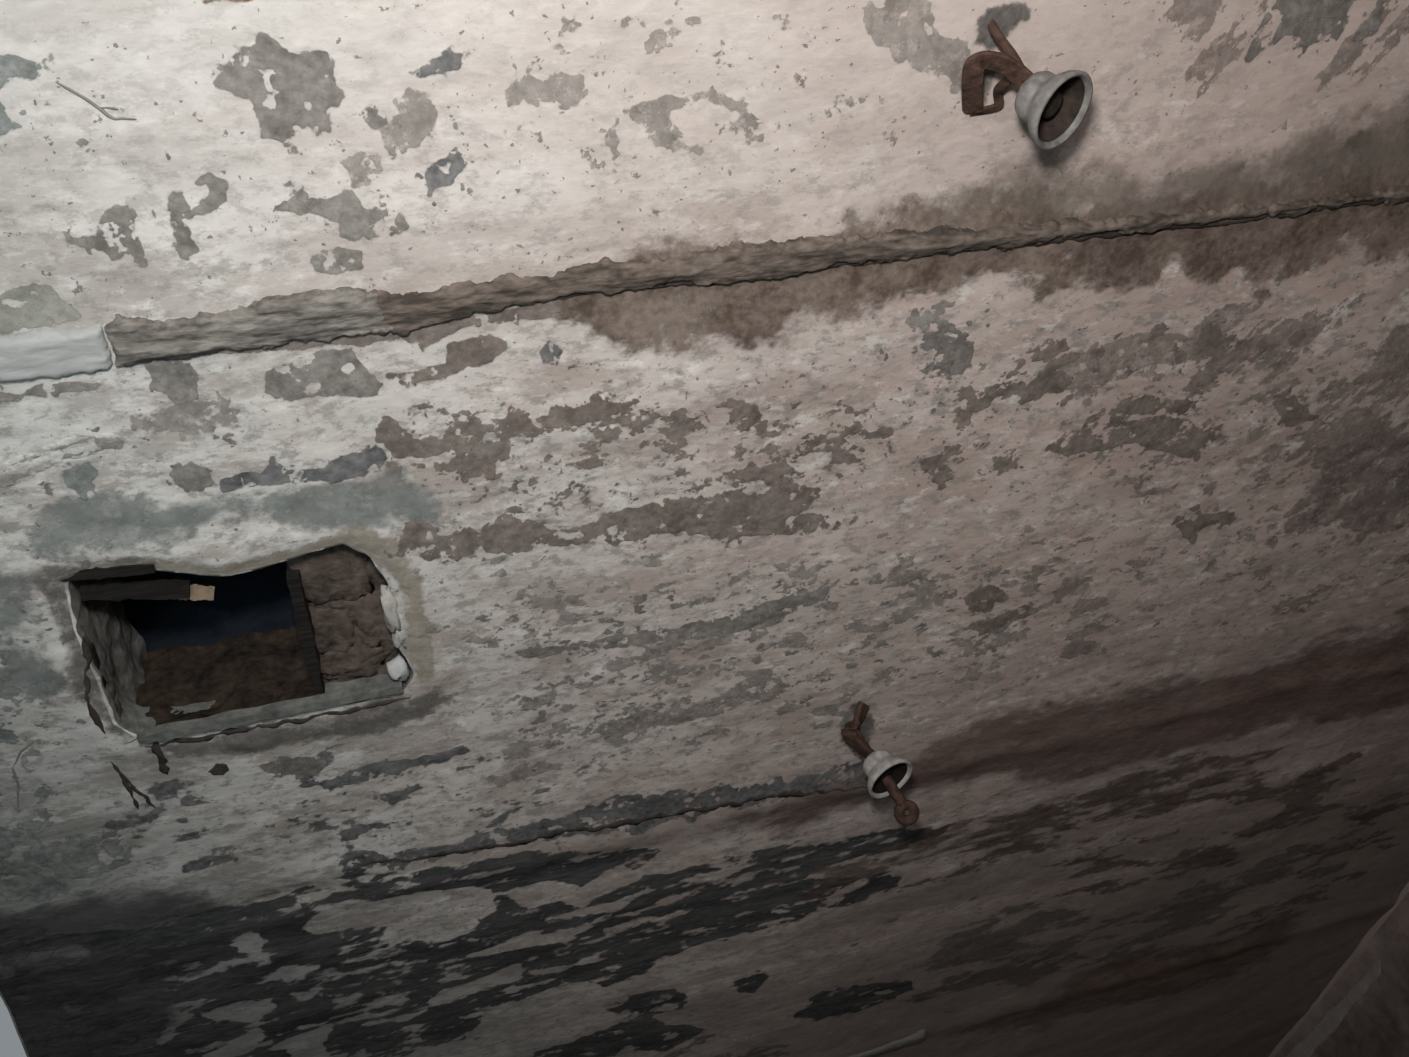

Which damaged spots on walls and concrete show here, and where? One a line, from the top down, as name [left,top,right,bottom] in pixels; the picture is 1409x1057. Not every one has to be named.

peeling [621,2,700,53]
peeling [863,0,1030,108]
peeling [1159,0,1409,98]
crack [536,281,721,303]
flaking render [0,32,1409,499]
damp [554,114,1409,352]
crack [827,198,1385,269]
peeling [0,293,1409,1057]
damp [900,608,1409,790]
crack [352,786,867,866]
damp [732,776,870,828]
damp [0,892,216,1057]